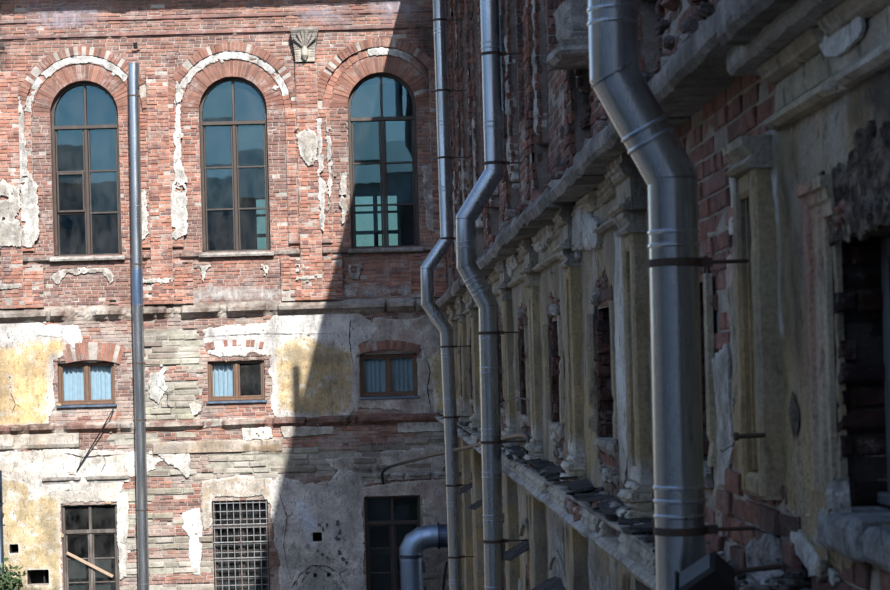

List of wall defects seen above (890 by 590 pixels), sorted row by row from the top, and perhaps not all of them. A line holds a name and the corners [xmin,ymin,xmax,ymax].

peeling [0,55,128,248]
peeling [170,51,290,239]
peeling [452,117,477,253]
peeling [504,36,520,189]
peeling [531,0,547,135]
peeling [819,17,866,57]
peeling [148,365,168,409]
flaking render [674,75,890,590]